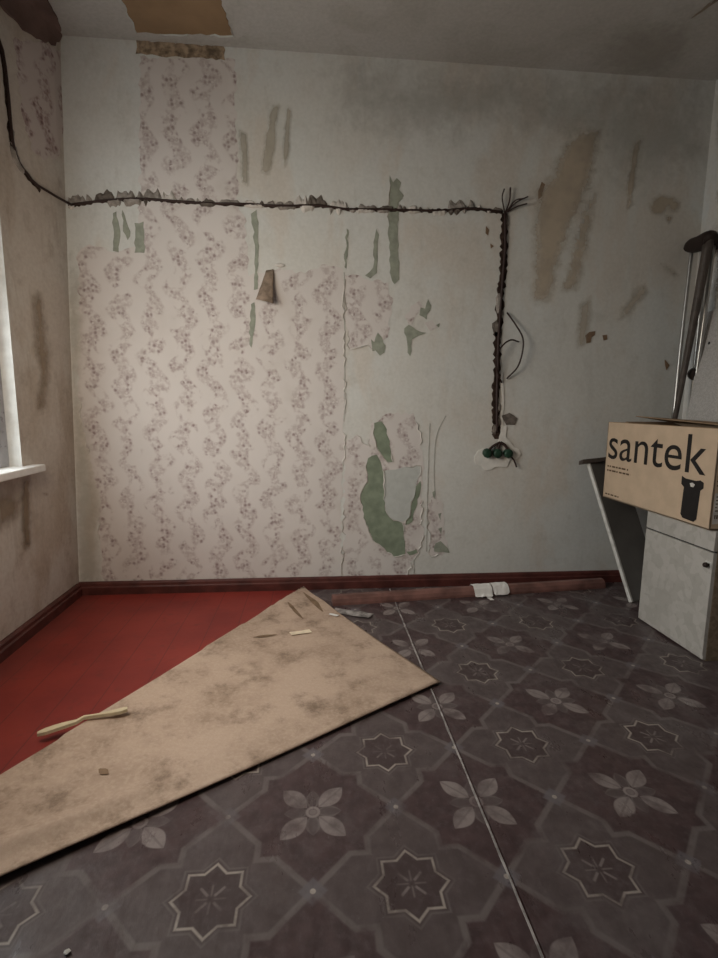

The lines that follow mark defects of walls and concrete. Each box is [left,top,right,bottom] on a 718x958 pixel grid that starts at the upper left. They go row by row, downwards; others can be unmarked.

peeling [121,0,233,38]
crack [340,275,348,413]
peeling [373,421,435,525]
peeling [434,513,450,553]